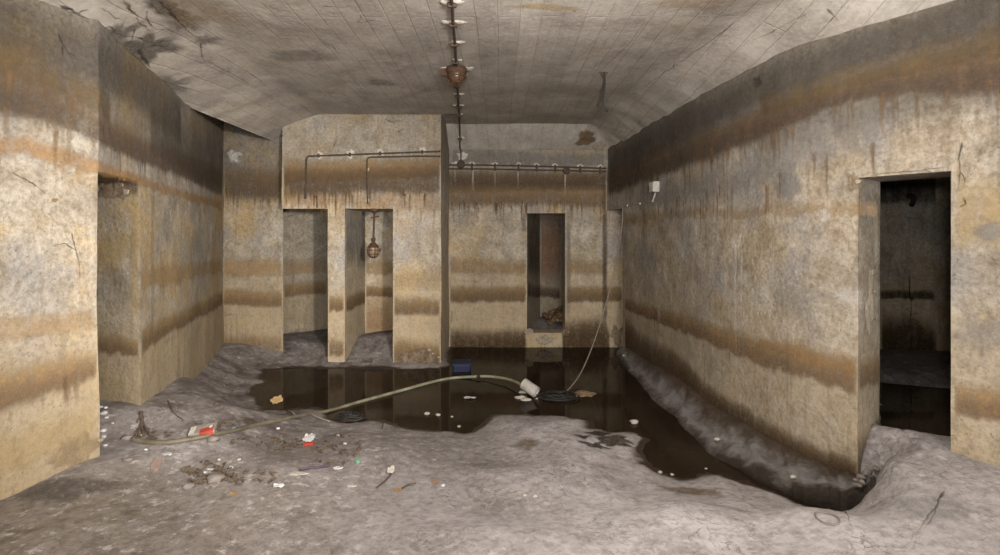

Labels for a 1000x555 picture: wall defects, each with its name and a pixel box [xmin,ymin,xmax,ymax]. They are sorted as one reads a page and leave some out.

water stain [0,0,1000,393]
crack [880,142,966,206]
water stain [0,358,95,409]
water stain [625,322,856,474]